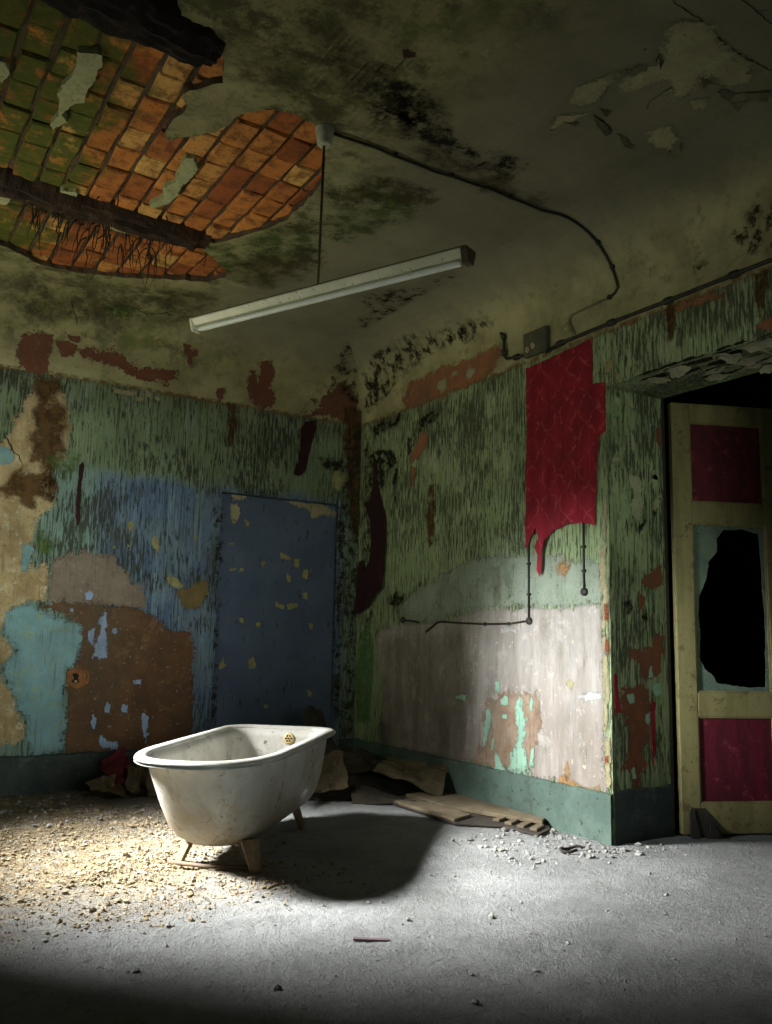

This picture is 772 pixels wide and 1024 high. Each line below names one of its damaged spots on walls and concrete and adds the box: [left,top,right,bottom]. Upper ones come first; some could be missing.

flaking render [0,197,228,276]
flaking render [0,0,323,239]
damp [243,12,516,194]
peeling [550,20,770,149]
peeling [629,333,772,384]
peeling [0,330,199,756]
damp [319,320,486,735]
flaking render [375,494,667,792]